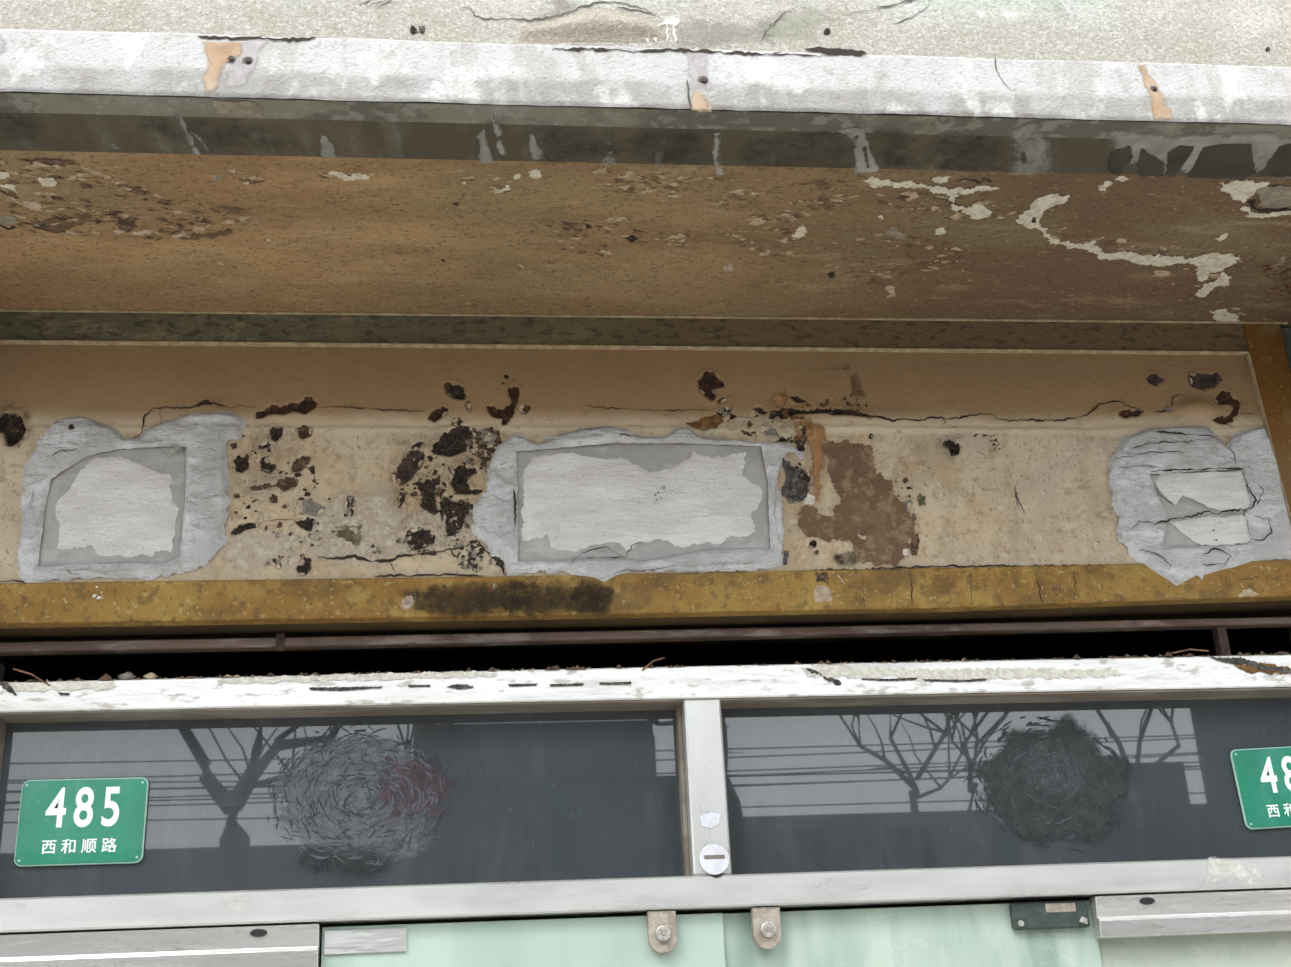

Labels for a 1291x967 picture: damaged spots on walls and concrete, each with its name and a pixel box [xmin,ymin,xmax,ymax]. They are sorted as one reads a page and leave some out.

crack [847,0,929,24]
crack [463,1,866,110]
peeling [0,157,254,241]
peeling [311,165,375,181]
peeling [489,169,542,193]
peeling [593,167,1291,322]
corrosion [256,397,317,418]
peeling [779,433,926,567]
crack [584,393,1272,571]
crack [572,540,676,580]
leakage [405,582,614,620]
peeling [813,572,845,602]